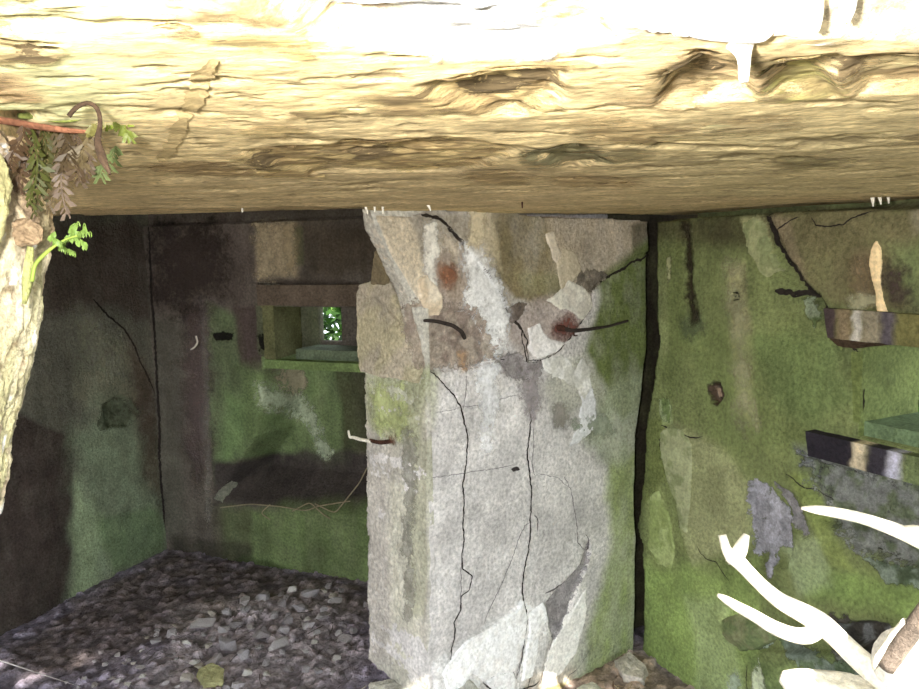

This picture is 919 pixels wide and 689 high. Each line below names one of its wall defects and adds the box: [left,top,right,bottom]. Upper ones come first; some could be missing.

crack [93,227,165,525]
crack [421,213,464,246]
corrosion [437,264,457,290]
spalling [401,274,596,446]
corrosion [551,313,578,341]
peeling [545,232,607,320]
crack [766,210,871,308]
crack [426,254,649,689]
spalling [746,478,810,578]
spalling [796,449,919,589]
peeling [442,544,591,689]